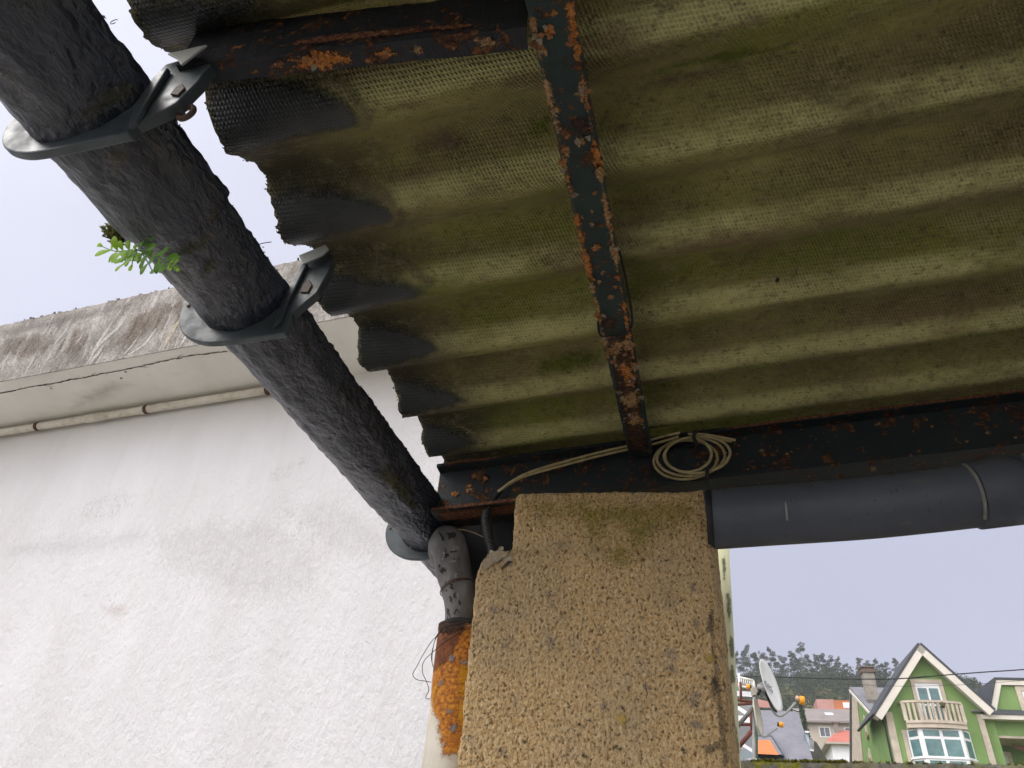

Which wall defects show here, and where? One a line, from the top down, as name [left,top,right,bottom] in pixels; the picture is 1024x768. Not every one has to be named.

corrosion [270,23,496,73]
damp [209,72,373,152]
damp [272,187,393,245]
corrosion [527,1,648,428]
damp [321,246,433,316]
damp [359,324,437,371]
damp [394,380,486,463]
corrosion [430,624,472,758]